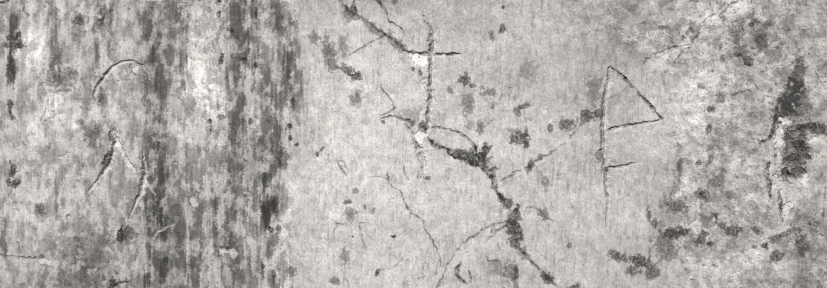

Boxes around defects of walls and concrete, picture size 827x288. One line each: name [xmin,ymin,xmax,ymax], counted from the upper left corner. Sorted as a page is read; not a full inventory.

crack [336,0,409,57]
crack [640,0,761,68]
crack [380,86,395,108]
leakage [38,0,365,288]
crack [336,114,601,288]
crack [325,217,366,288]